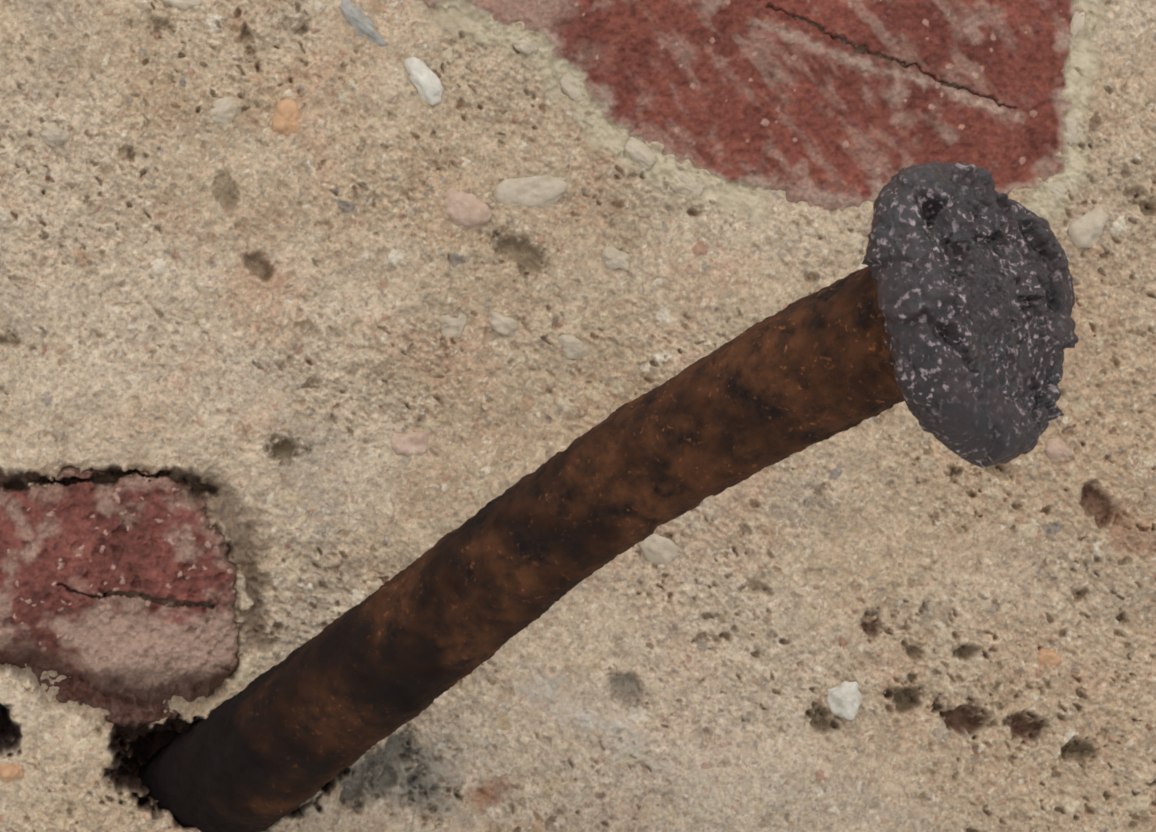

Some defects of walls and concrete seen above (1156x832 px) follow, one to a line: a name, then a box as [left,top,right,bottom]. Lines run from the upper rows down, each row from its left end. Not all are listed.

crack [766,5,1016,108]